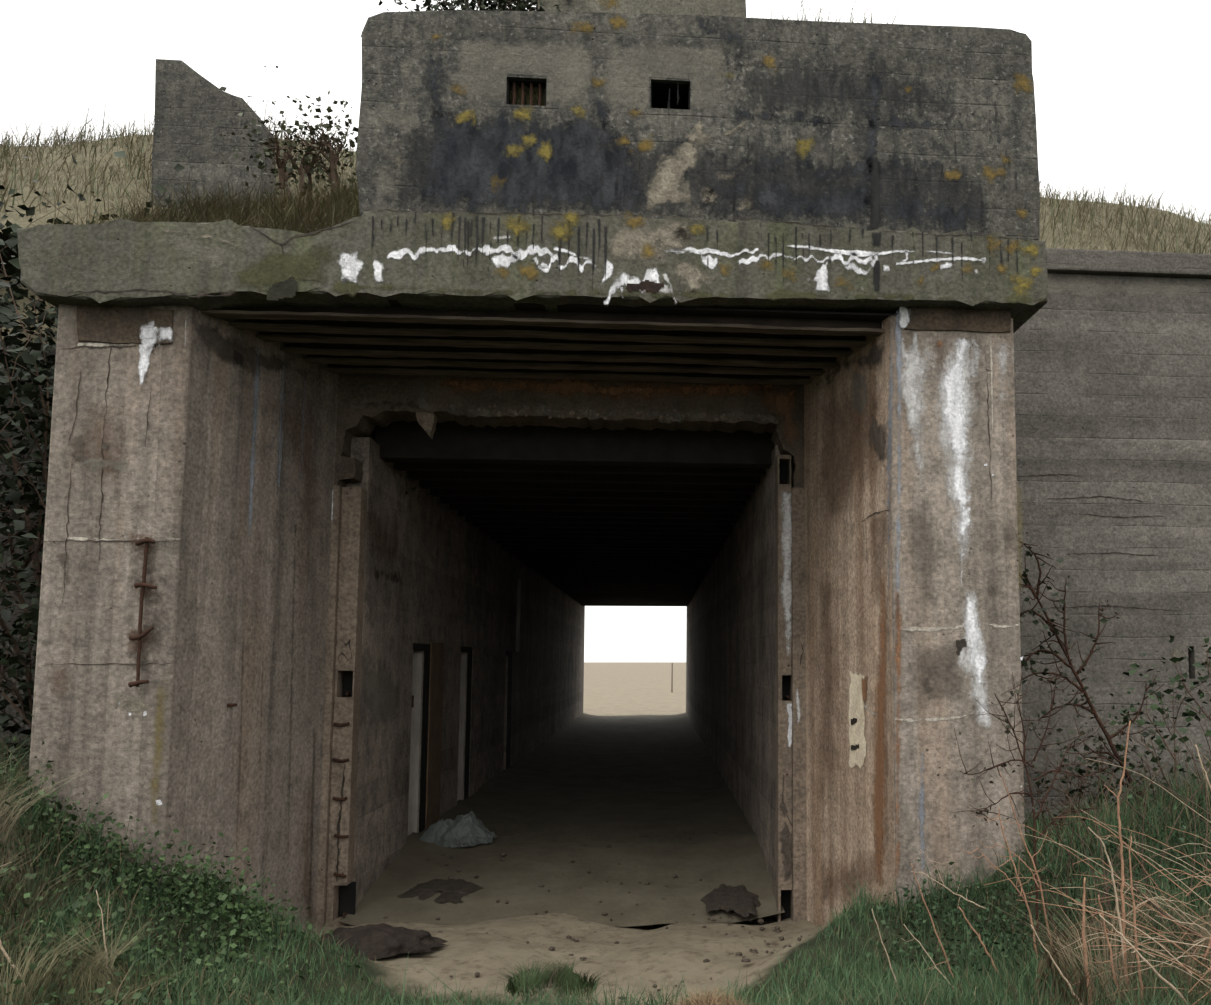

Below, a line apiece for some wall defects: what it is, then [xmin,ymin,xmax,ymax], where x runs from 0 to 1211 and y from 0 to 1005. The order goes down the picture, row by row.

damp [339,52,1018,291]
damp [138,322,306,524]
damp [939,339,971,582]
corrosion [128,537,157,688]
damp [956,595,991,726]